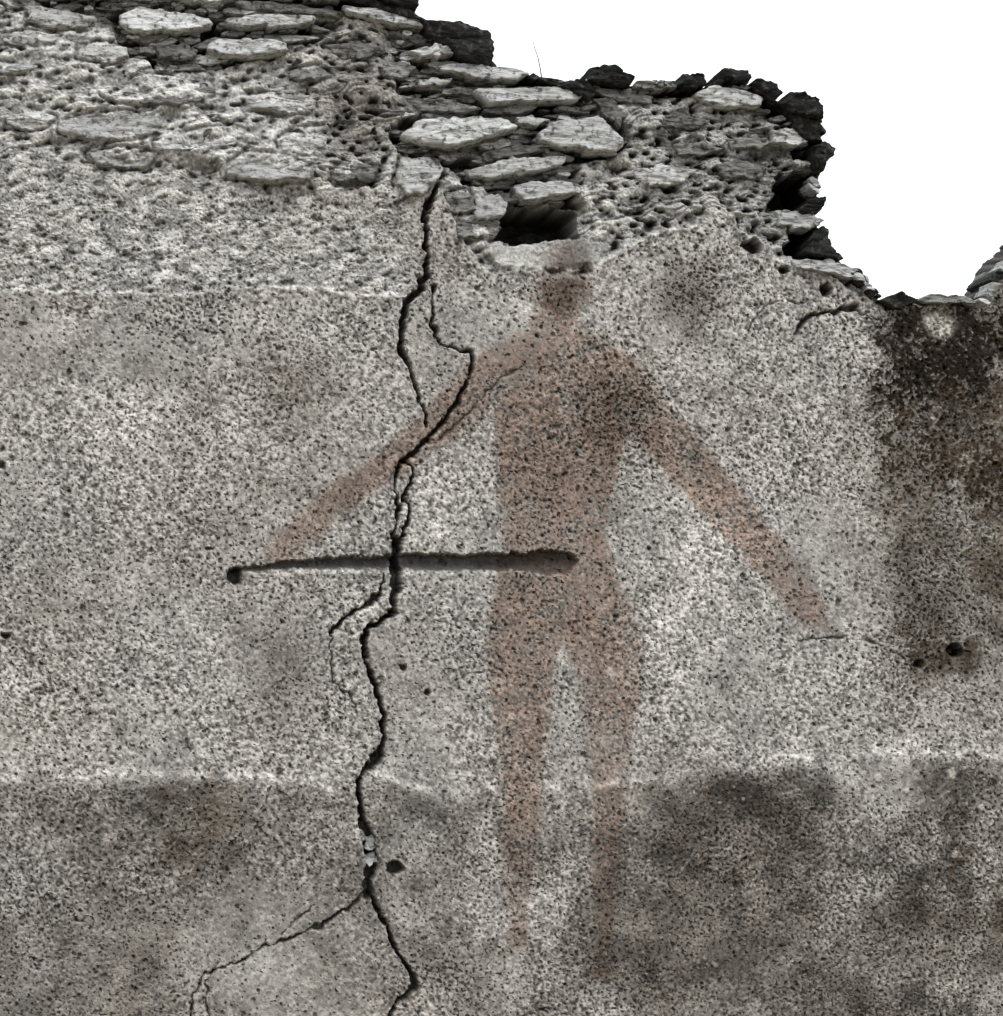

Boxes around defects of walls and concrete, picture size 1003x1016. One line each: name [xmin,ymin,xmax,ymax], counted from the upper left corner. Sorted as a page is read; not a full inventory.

spalling [771,174,802,212]
spalling [782,234,799,256]
damp [867,296,1003,517]
crack [187,181,527,1016]